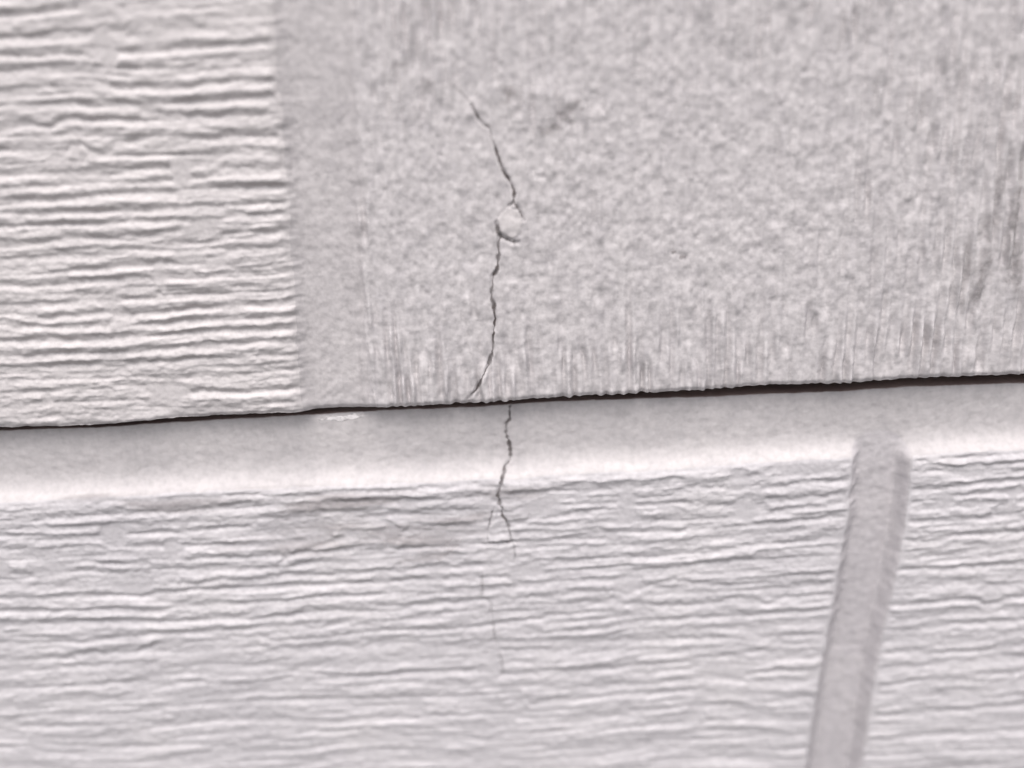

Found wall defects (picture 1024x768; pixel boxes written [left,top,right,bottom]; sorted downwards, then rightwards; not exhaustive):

crack [474,112,523,392]
crack [486,406,512,543]